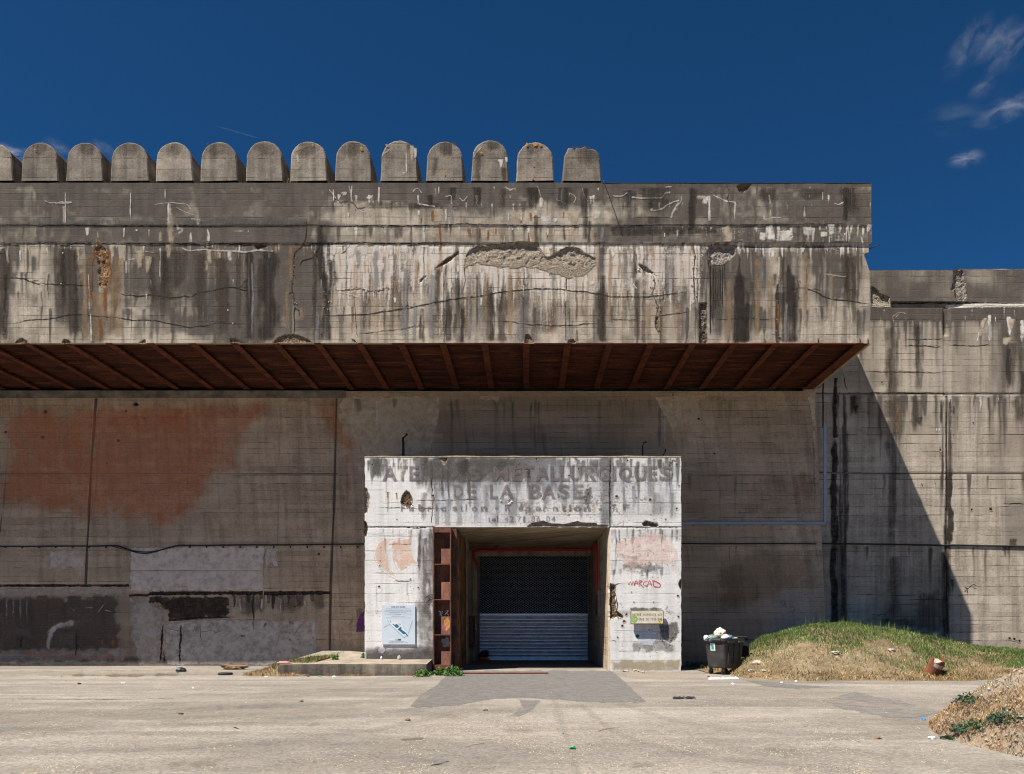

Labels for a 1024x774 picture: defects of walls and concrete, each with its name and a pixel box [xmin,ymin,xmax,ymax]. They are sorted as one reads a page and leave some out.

rust [83,247,120,341]
water stain [312,226,493,342]
crack [2,186,844,330]
crack [330,269,689,341]
spalling [434,241,596,279]
water stain [413,141,763,341]
spalling [691,243,736,343]
water stain [760,187,856,342]
spalling [387,490,413,509]
water stain [829,378,858,622]
water stain [884,401,954,634]
spalling [609,583,635,638]